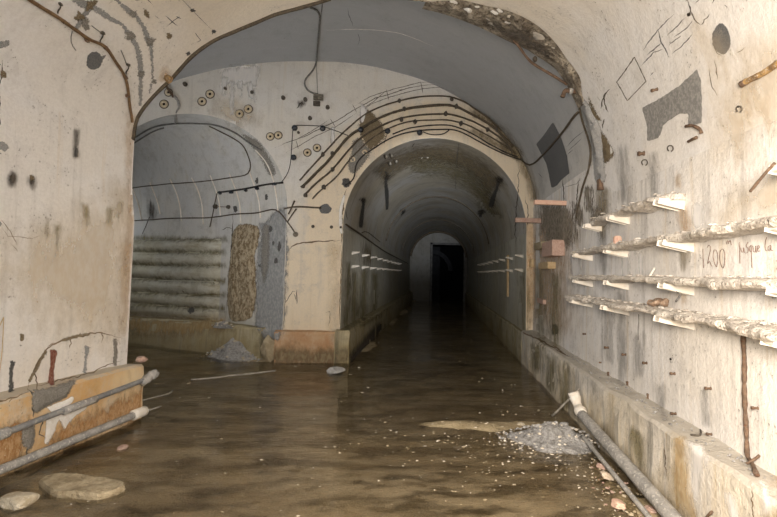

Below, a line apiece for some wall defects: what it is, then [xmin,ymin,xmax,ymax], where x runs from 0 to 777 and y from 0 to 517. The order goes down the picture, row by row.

spalling [409,0,614,187]
spalling [31,380,87,445]
crack [0,332,121,455]